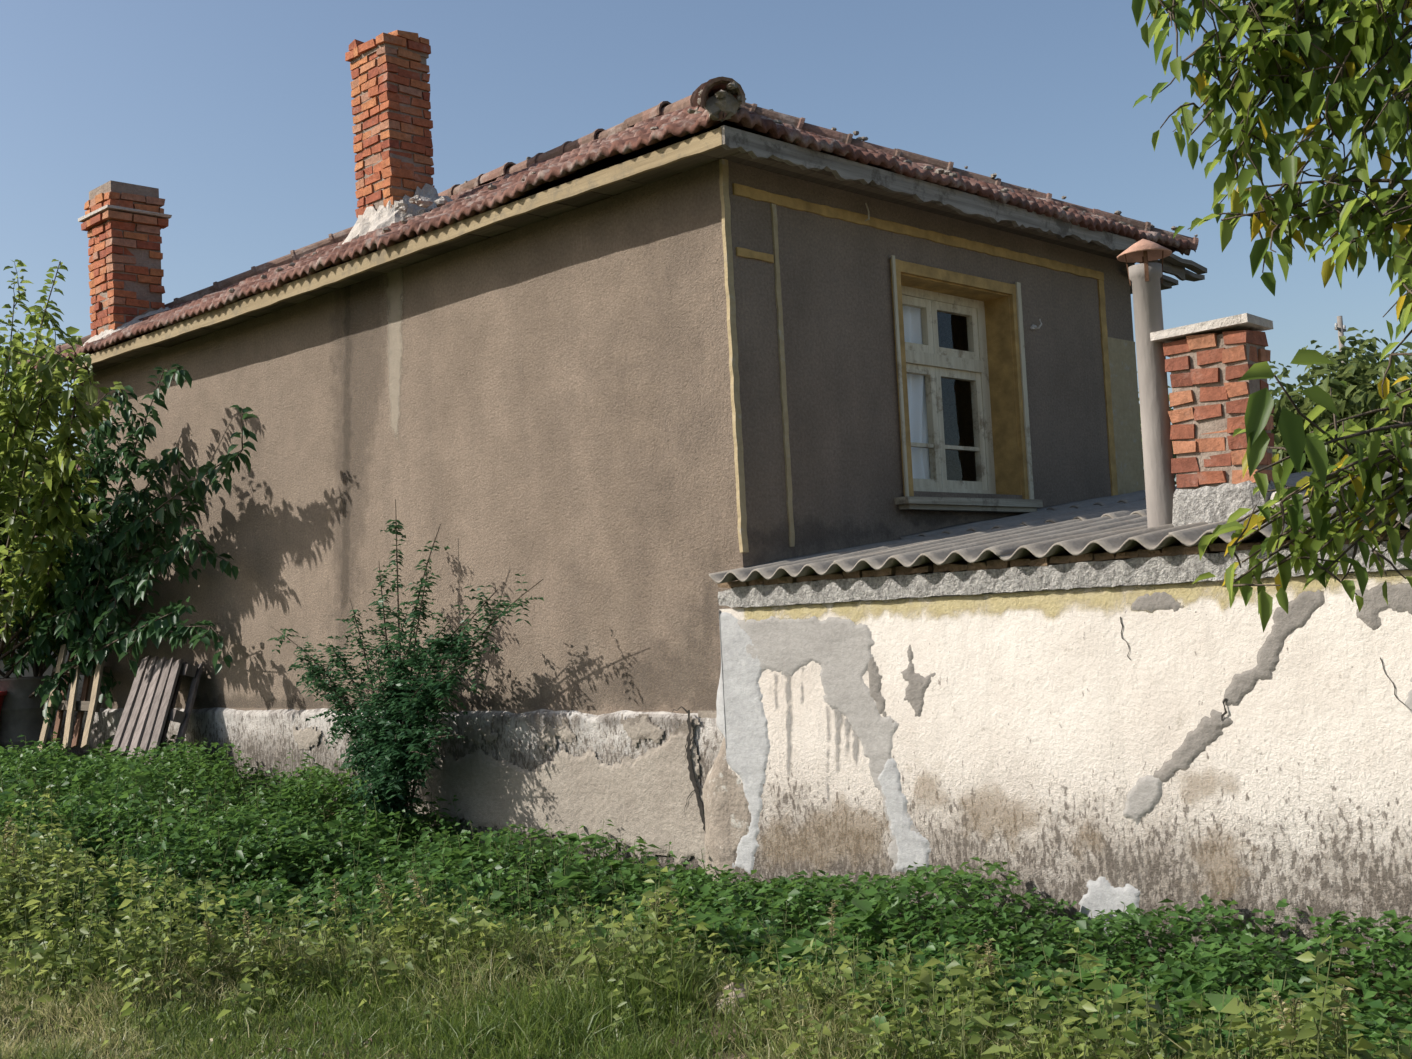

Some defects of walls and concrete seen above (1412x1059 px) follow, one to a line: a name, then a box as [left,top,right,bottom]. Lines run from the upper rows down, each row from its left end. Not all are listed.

flaking render [1125,592,1207,615]
flaking render [1355,582,1412,630]
flaking render [901,645,936,717]
flaking render [293,725,325,750]
flaking render [415,639,726,873]
crack [672,706,705,831]
peeling [878,758,931,872]
peeling [1123,775,1163,825]